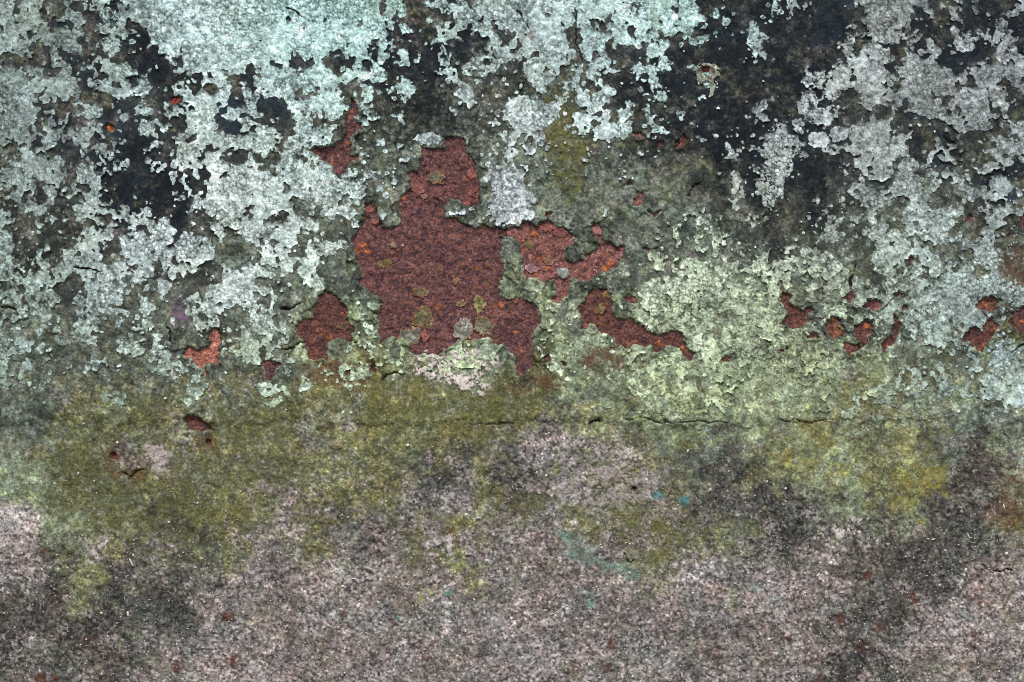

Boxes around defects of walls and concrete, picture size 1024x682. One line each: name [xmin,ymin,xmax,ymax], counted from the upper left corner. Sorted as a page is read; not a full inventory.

corrosion [311,100,361,175]
peeling [0,0,1024,437]
corrosion [351,137,695,376]
corrosion [184,329,221,376]
corrosion [295,291,356,361]
corrosion [781,292,908,356]
corrosion [963,296,1024,352]
damp [614,447,643,460]
damp [0,505,25,560]
damp [89,536,108,564]
damp [425,535,454,569]
damp [832,517,889,551]